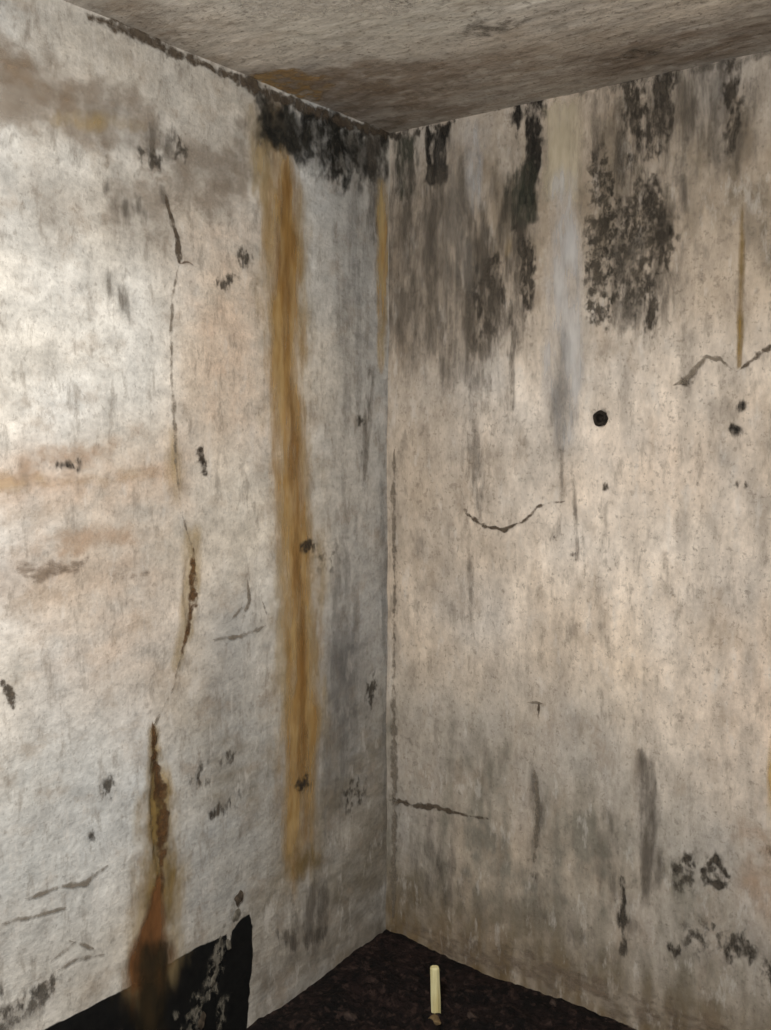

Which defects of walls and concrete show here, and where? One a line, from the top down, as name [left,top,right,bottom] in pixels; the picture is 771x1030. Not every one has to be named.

water stain [702,58,743,153]
water stain [258,87,465,347]
water stain [450,70,695,401]
crack [674,345,771,385]
rust [254,141,318,869]
crack [465,501,563,533]
rust [128,722,176,1030]
mould [667,923,771,983]
mould [0,975,55,1030]